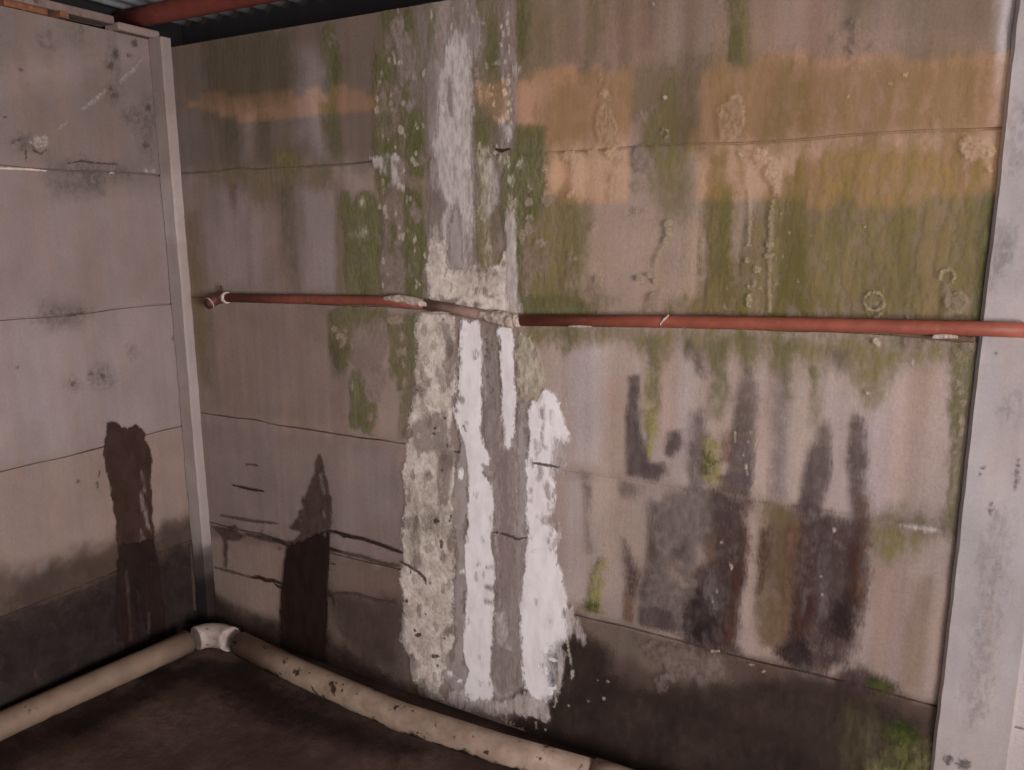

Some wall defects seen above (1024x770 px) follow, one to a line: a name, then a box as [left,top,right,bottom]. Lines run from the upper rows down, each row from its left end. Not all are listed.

water stain [975,191,994,320]
water stain [213,0,928,770]
crack [232,463,264,492]
water stain [0,422,198,711]
crack [216,568,283,589]
crack [220,515,291,549]
crack [326,530,403,605]